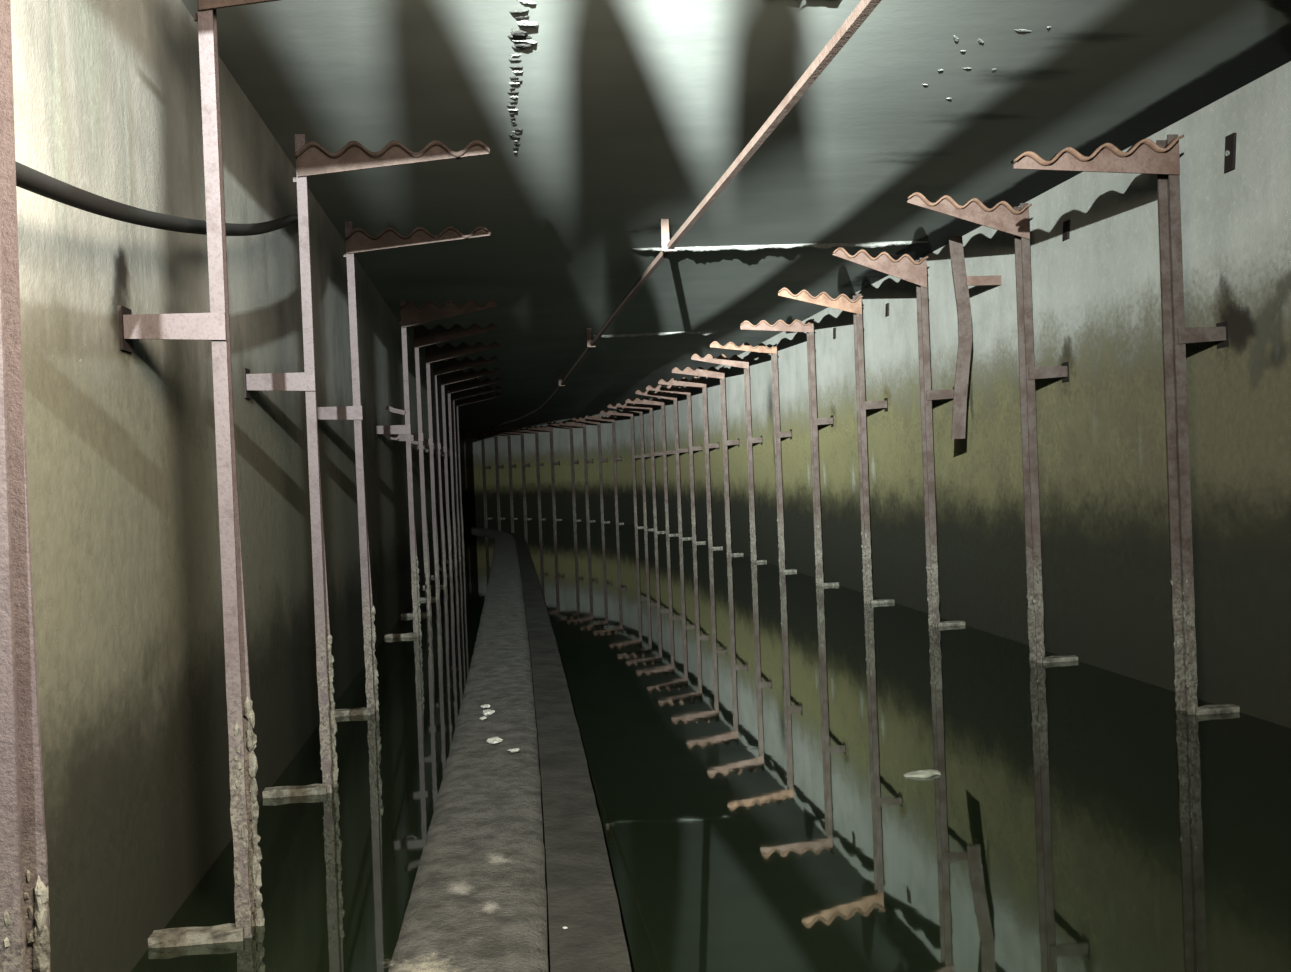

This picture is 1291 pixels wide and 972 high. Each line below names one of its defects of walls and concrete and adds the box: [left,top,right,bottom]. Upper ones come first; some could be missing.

leakage [248,465,1175,804]
leakage [1192,503,1291,728]
leakage [44,644,233,972]